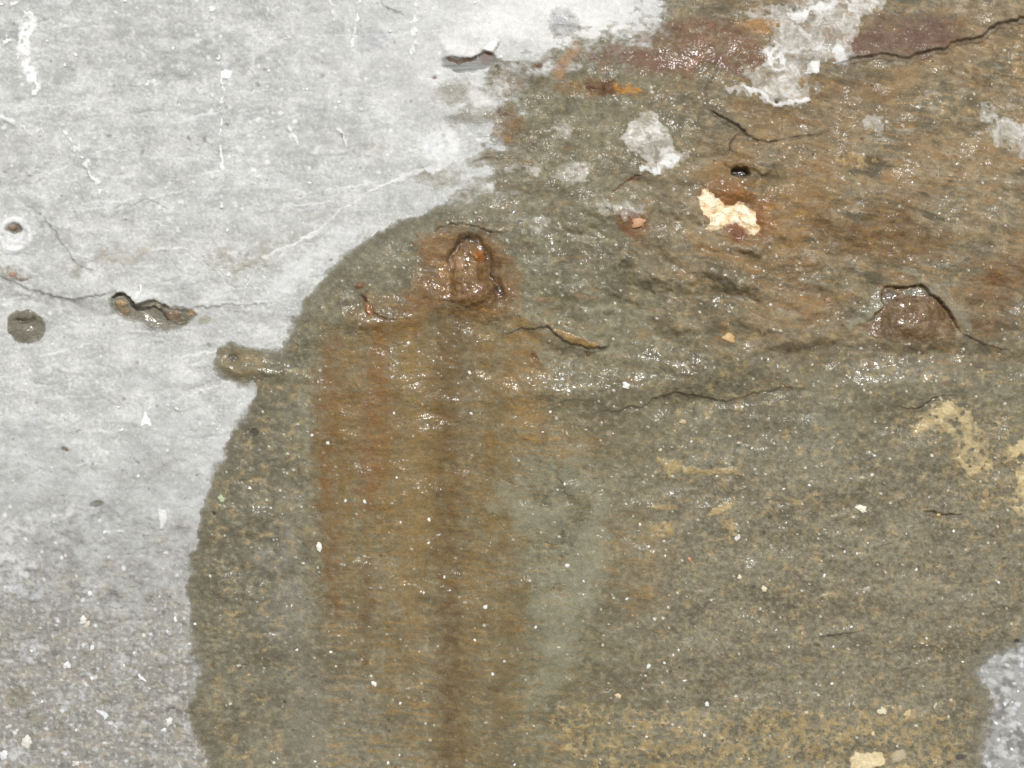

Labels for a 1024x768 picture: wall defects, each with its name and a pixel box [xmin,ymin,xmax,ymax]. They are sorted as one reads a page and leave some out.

spalling [431,40,499,79]
crack [837,14,1024,66]
efflorescence [619,110,690,177]
crack [702,67,830,153]
leakage [979,101,1024,160]
spalling [697,189,760,243]
crack [152,245,272,310]
spalling [108,291,198,333]
crack [496,323,611,354]
corrosion [282,214,609,768]
leakage [520,491,615,699]
leakage [269,527,412,768]